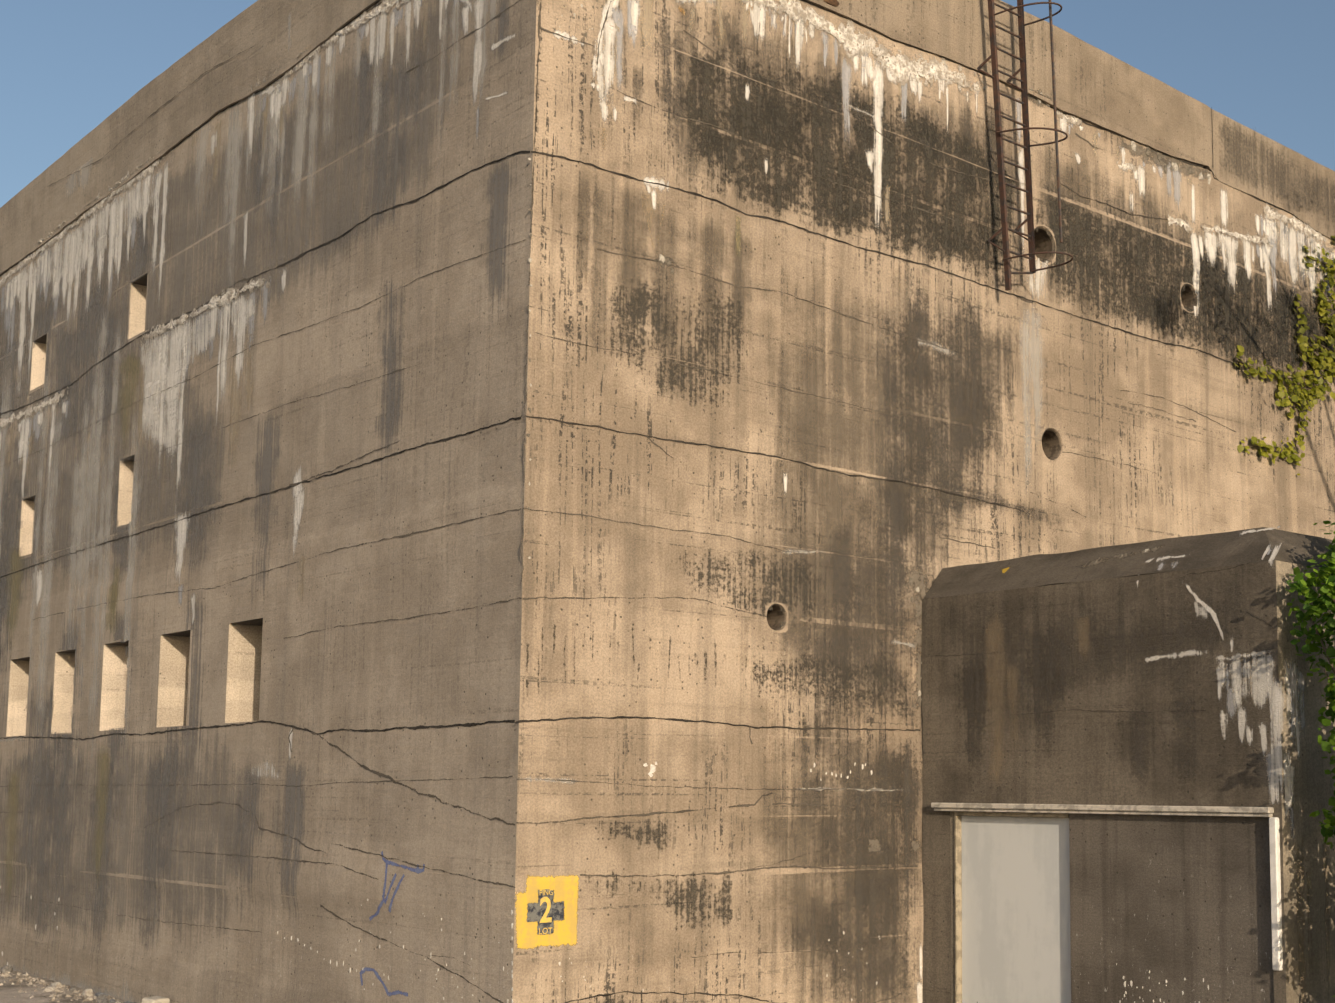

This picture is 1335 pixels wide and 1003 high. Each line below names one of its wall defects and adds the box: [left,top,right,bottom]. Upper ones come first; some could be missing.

leakage [605,195,748,420]
leakage [554,0,1335,377]
leakage [0,0,515,942]
leakage [953,584,1305,827]
crack [320,905,503,1003]
crack [565,991,786,1003]
leakage [764,730,923,1003]